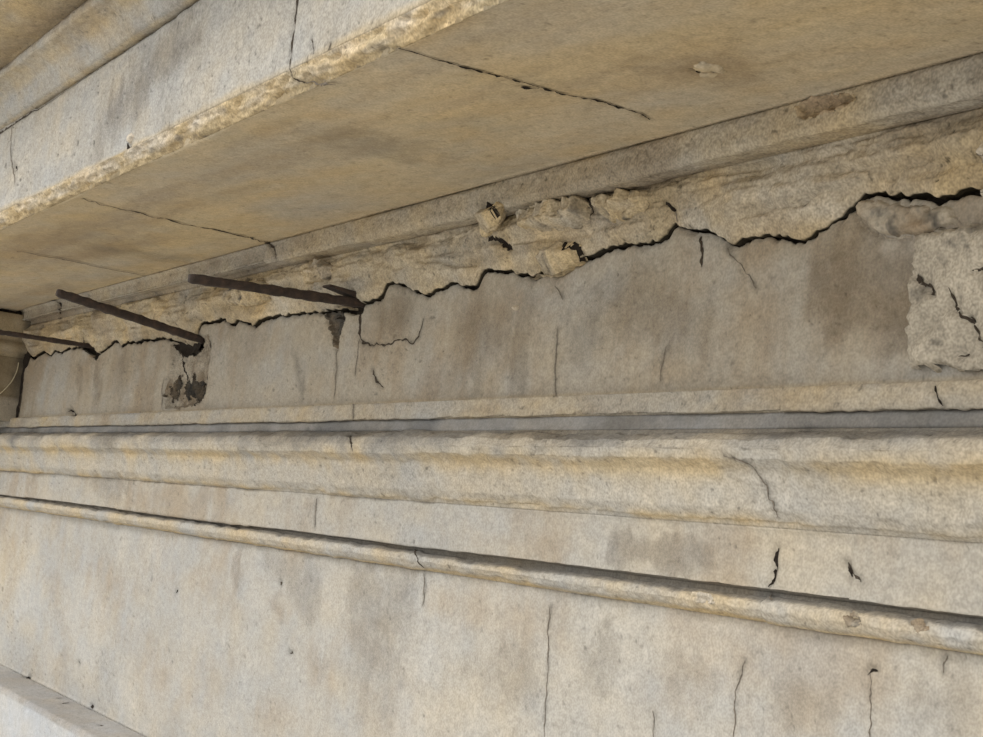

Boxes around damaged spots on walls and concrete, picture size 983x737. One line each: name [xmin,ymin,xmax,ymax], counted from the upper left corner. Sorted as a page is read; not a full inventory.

crack [885,191,981,205]
peeling [856,200,958,240]
peeling [530,241,588,280]
crack [778,237,807,245]
spalling [222,278,272,307]
rust [322,284,357,298]
crack [916,274,983,342]
crack [137,316,287,358]
spalling [324,312,346,349]
crack [335,303,423,388]
spalling [161,334,211,410]
crack [768,548,779,601]